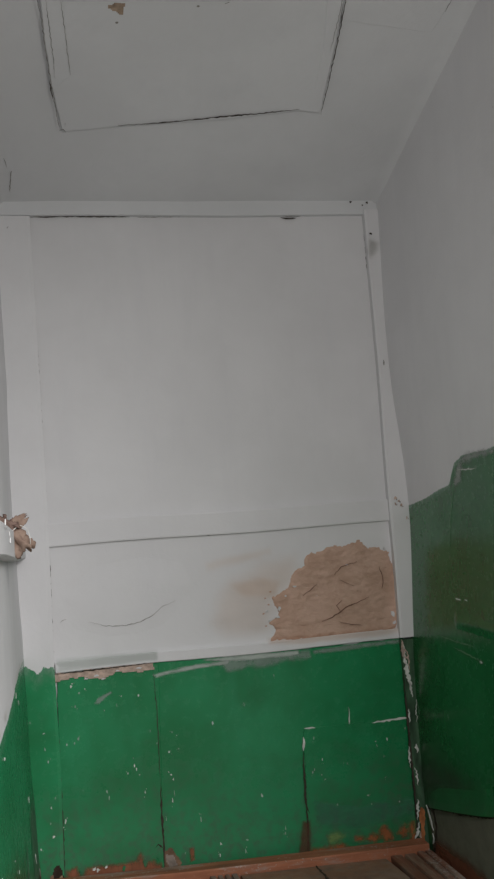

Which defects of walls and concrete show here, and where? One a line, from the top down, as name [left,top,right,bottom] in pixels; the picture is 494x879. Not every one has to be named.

crack [37,1,71,131]
peeling [108,3,125,24]
crack [321,0,346,111]
crack [119,109,298,126]
flaking render [263,540,397,641]
peeling [55,663,154,694]
peeling [356,638,494,879]